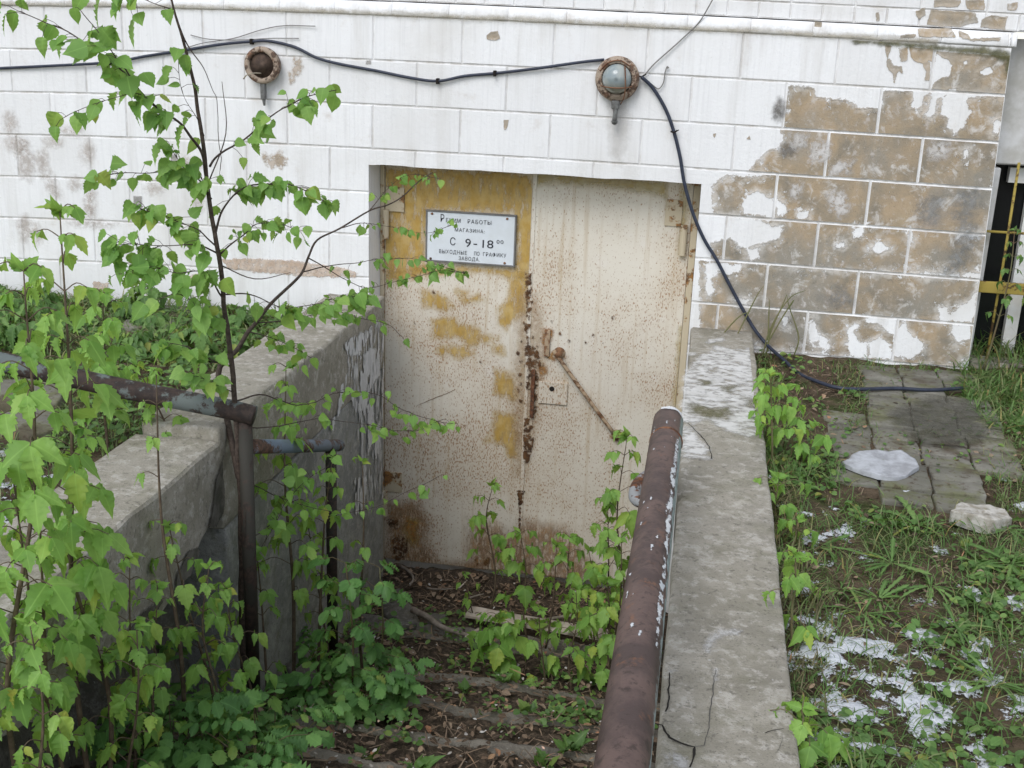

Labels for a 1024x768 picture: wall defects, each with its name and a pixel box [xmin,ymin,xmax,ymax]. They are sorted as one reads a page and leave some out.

peeling [331,320,384,515]
peeling [422,292,502,357]
peeling [489,414,517,456]
peeling [495,373,513,398]
peeling [386,168,665,327]
corrosion [516,273,570,463]
peeling [650,0,1018,646]
crack [655,671,716,767]